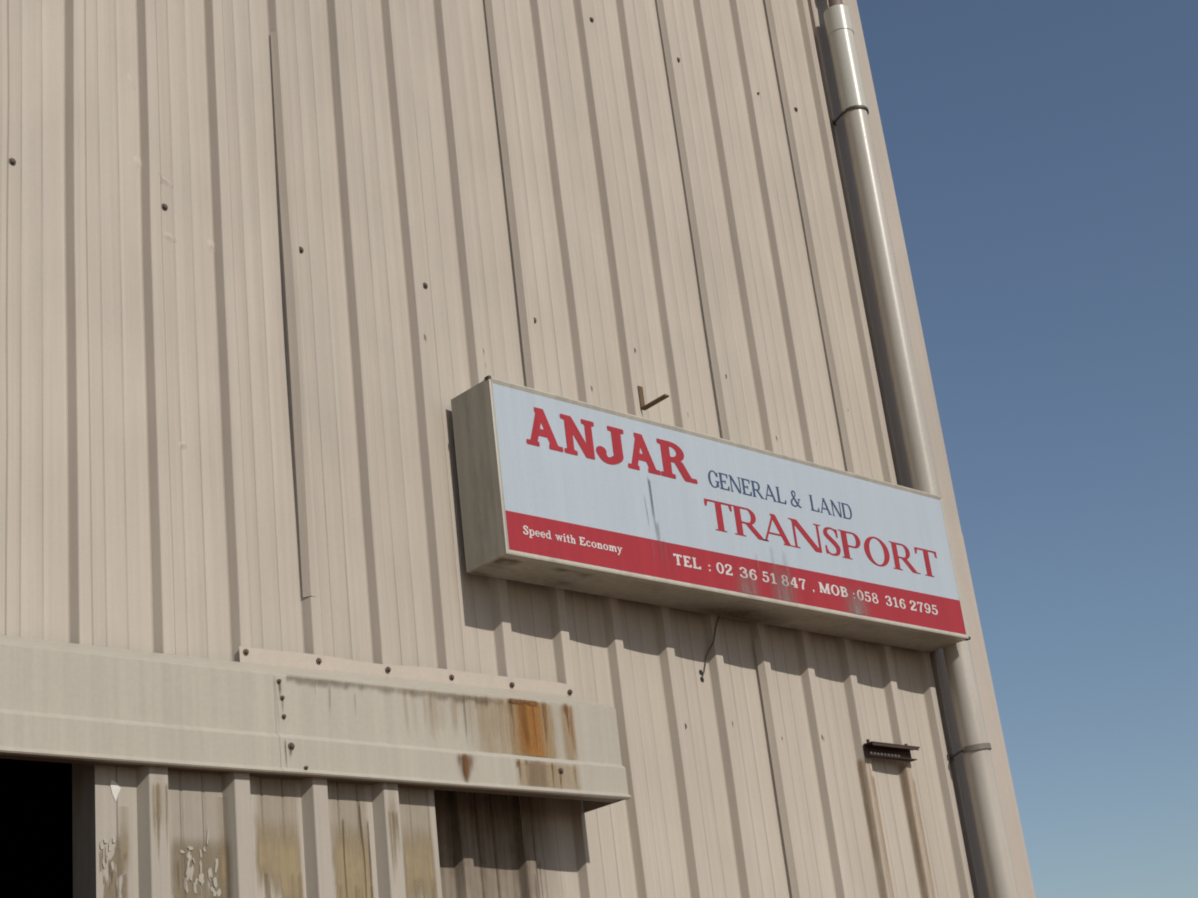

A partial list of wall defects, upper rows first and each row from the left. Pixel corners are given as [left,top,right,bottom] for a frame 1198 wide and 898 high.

corrosion [509,699,574,787]
peeling [100,837,128,898]
peeling [173,828,230,898]
leakage [258,826,302,898]
leakage [334,804,373,898]
leakage [390,790,541,898]